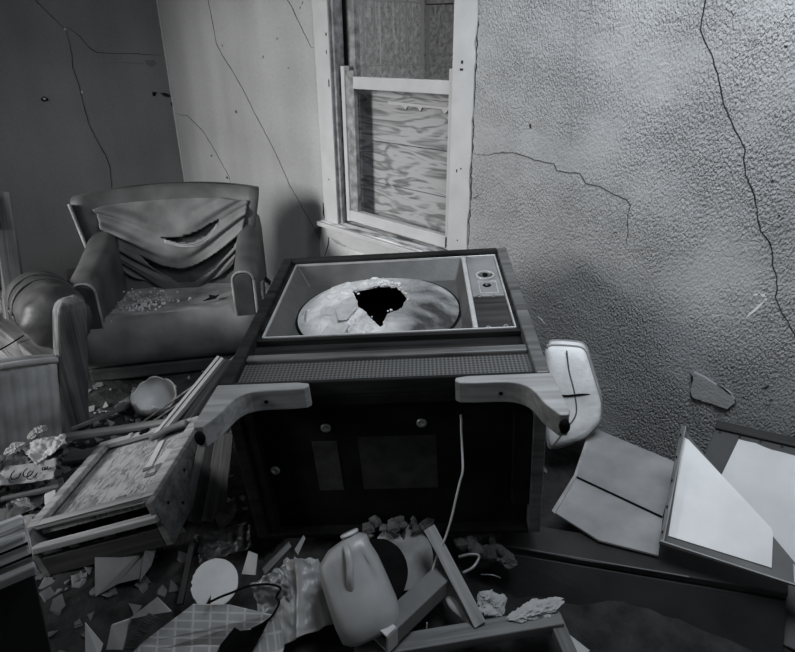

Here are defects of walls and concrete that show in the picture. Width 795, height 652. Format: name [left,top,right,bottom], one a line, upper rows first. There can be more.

crack [36,1,151,187]
crack [208,1,329,256]
crack [468,0,631,243]
crack [700,0,795,336]
crack [689,374,736,410]